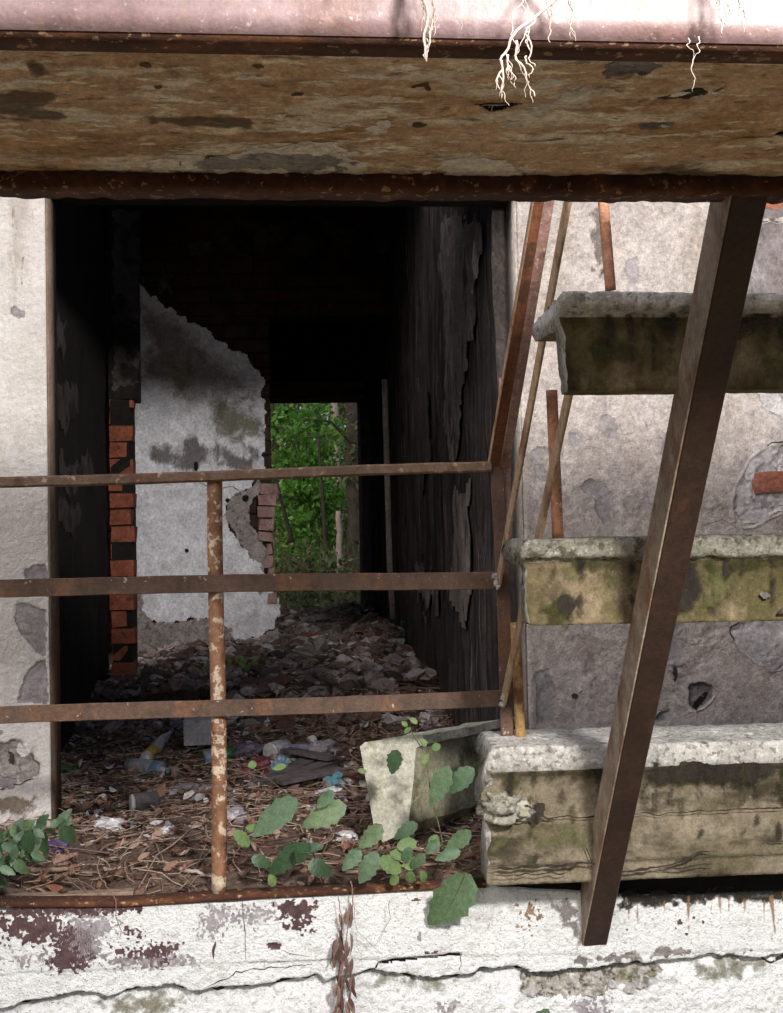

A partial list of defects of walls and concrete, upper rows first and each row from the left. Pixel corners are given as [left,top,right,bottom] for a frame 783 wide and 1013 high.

leakage [28,62,45,77]
leakage [0,91,66,121]
flaking render [747,203,783,294]
flaking render [729,441,783,530]
flaking render [223,480,280,574]
leakage [678,560,702,612]
flaking render [137,594,209,649]
flaking render [666,623,715,712]
flaking render [0,730,40,789]
peeling [0,906,201,976]
peeling [193,899,319,959]
crack [707,953,783,963]